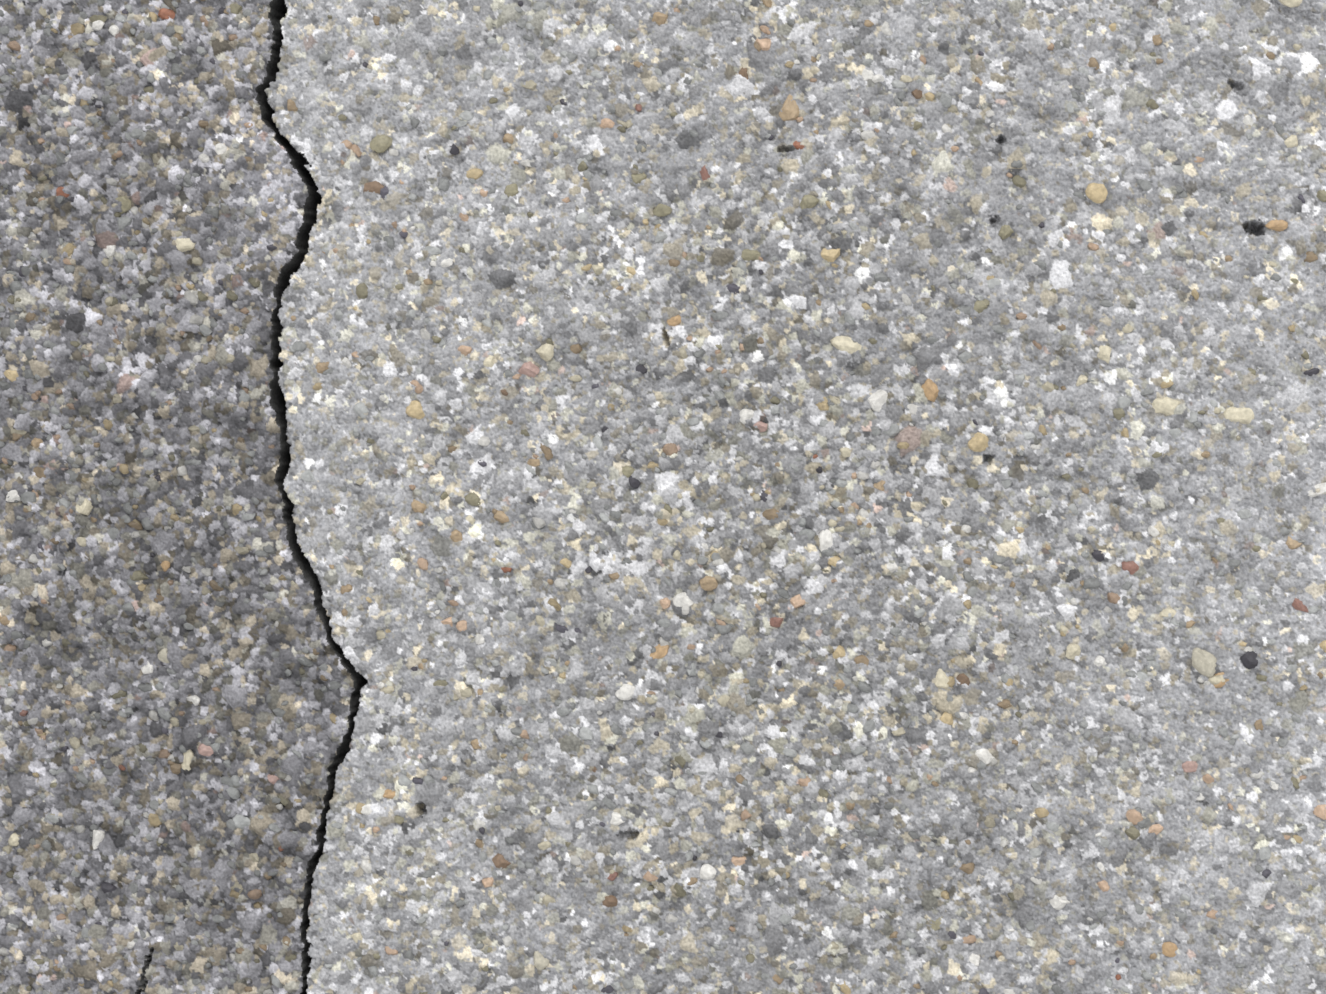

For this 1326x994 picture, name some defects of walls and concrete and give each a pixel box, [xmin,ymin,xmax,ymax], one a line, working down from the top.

crack [255,0,368,994]